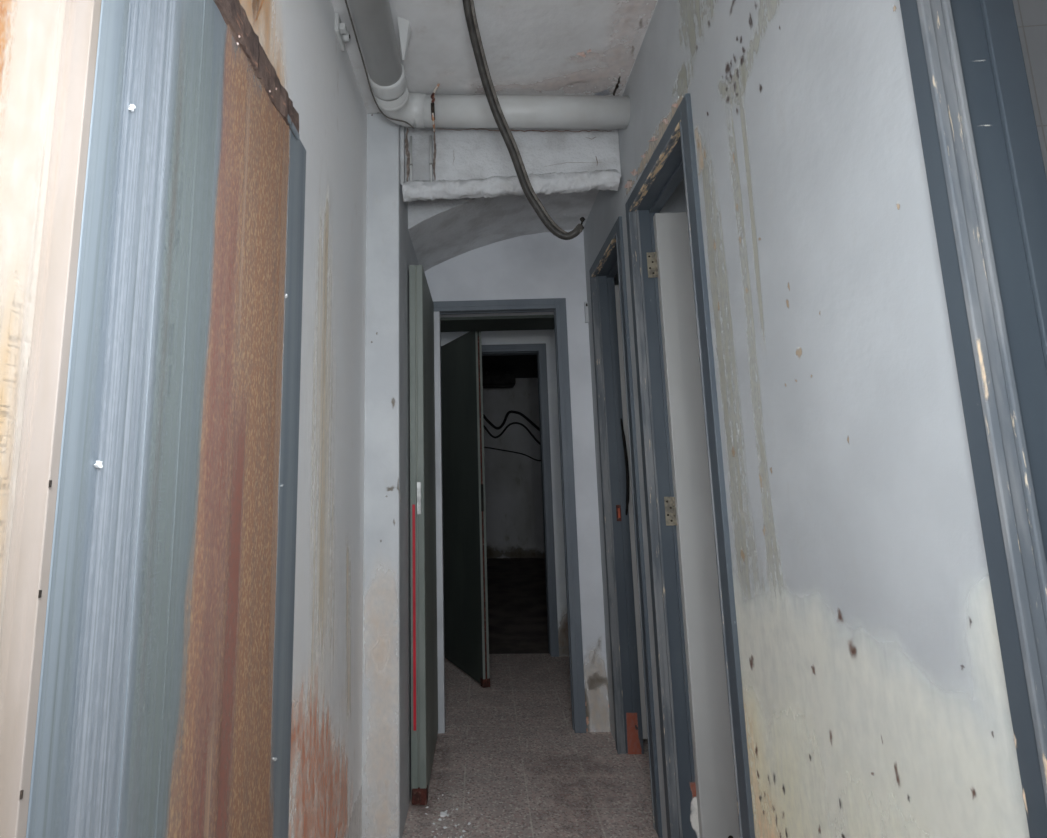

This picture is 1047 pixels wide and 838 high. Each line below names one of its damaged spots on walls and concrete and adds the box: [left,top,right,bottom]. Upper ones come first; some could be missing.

rust [0,0,66,634]
rust [167,24,290,838]
damp [313,214,328,609]
peeling [624,96,683,194]
damp [697,0,1030,838]
rust [290,688,348,838]